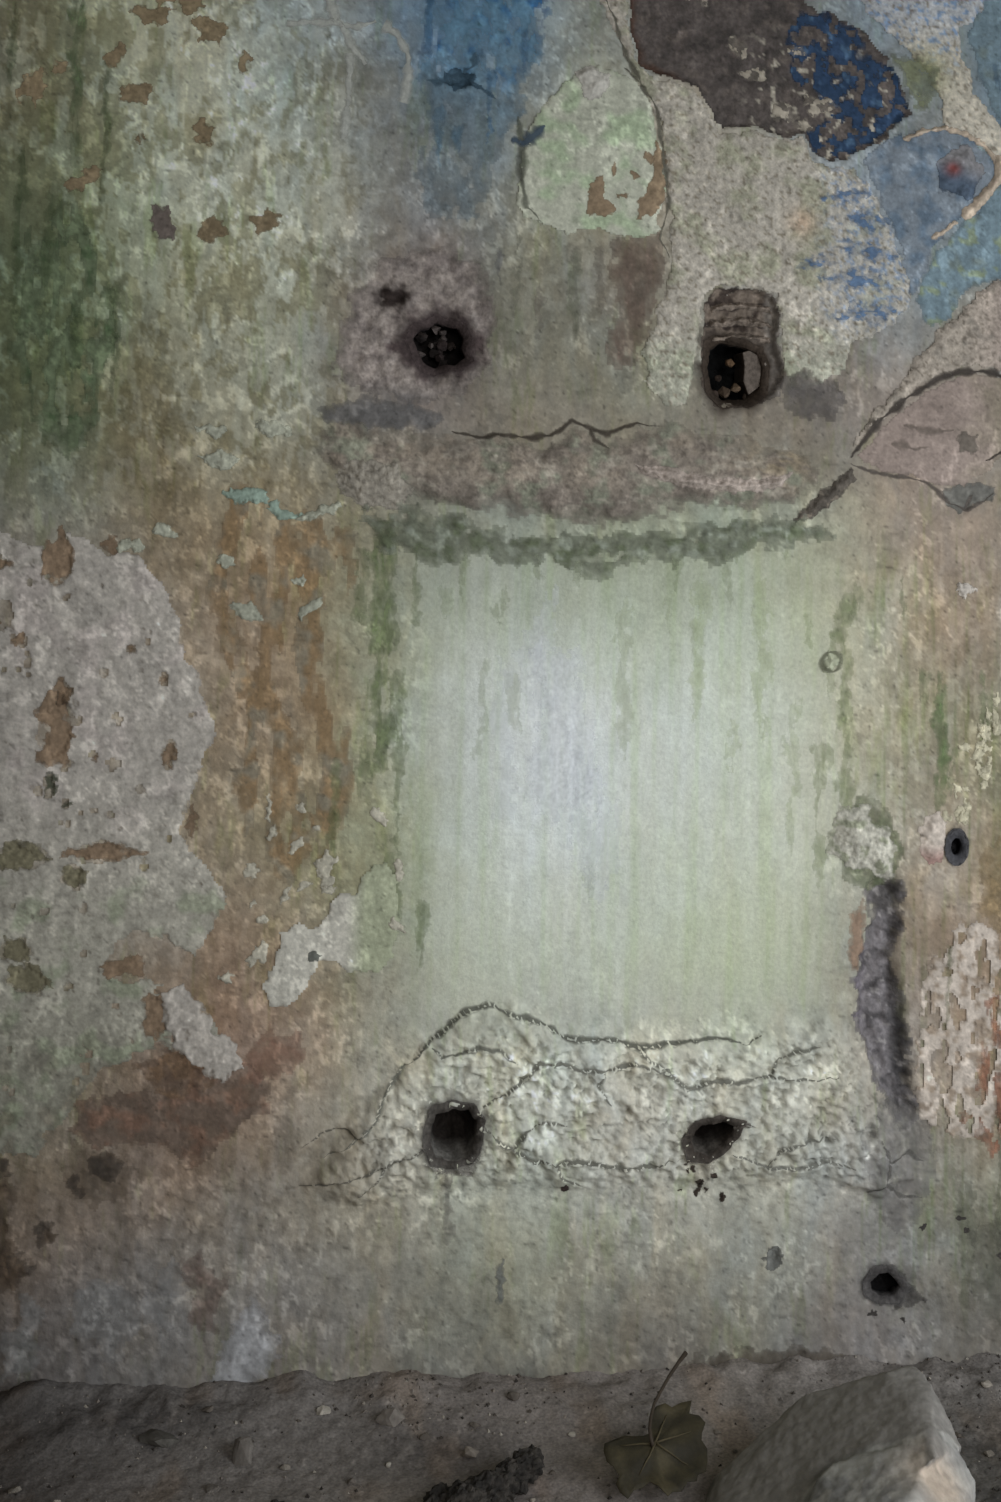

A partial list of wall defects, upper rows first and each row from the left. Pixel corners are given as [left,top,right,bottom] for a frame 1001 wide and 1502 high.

spalling [511,0,1001,412]
peeling [194,423,342,521]
crack [452,419,649,448]
crack [851,368,1001,511]
damp [366,510,826,651]
damp [372,671,395,766]
peeling [0,522,244,1158]
damp [847,797,902,890]
peeling [218,849,406,1007]
crack [299,1003,839,1198]
crack [733,1137,923,1198]
corrosion [976,999,1001,1157]